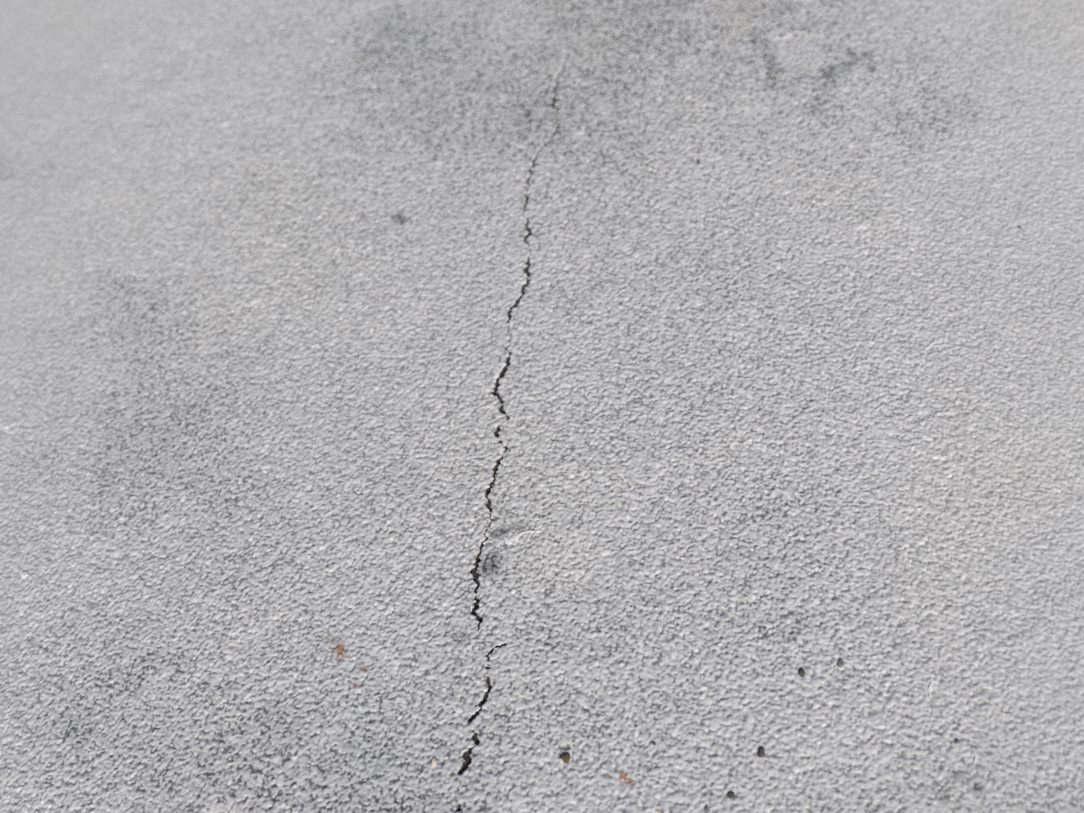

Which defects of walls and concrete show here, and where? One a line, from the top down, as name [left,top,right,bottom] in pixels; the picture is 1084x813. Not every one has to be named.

crack [459,71,563,774]